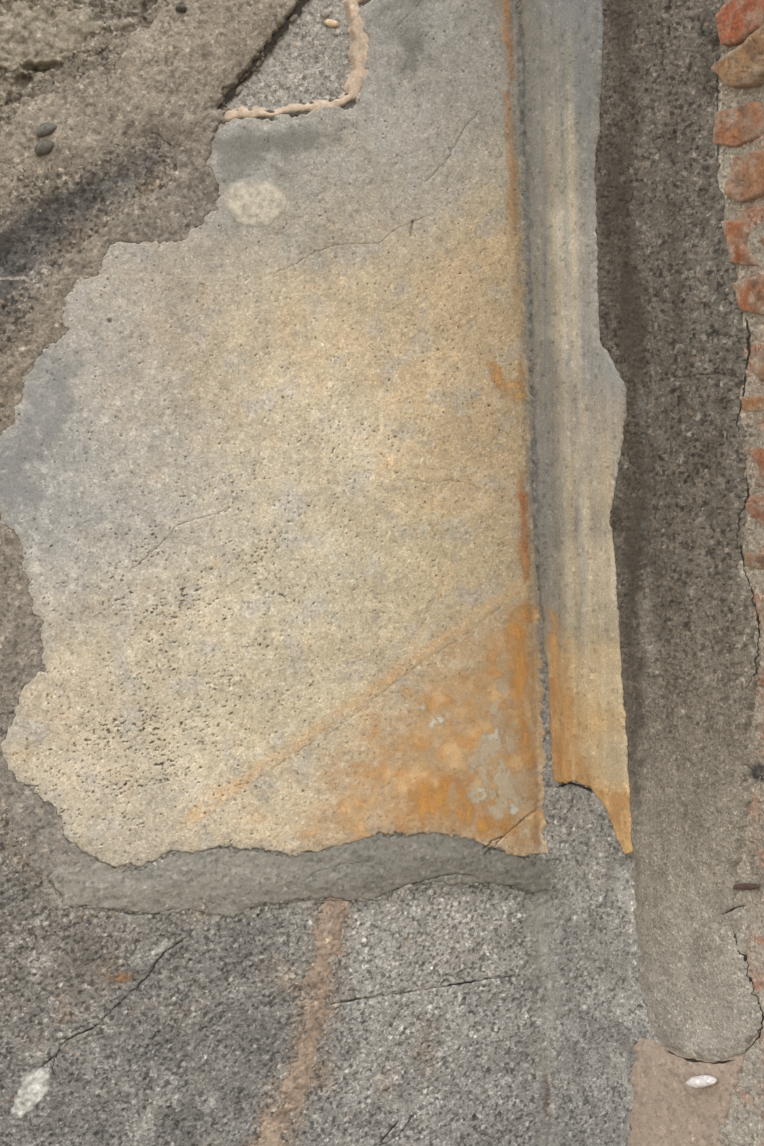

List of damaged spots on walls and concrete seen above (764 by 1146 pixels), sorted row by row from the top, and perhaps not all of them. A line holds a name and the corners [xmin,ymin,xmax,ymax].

spalling [223,0,352,110]
rust [339,609,544,842]
crack [31,929,196,1079]
crack [328,976,518,1005]